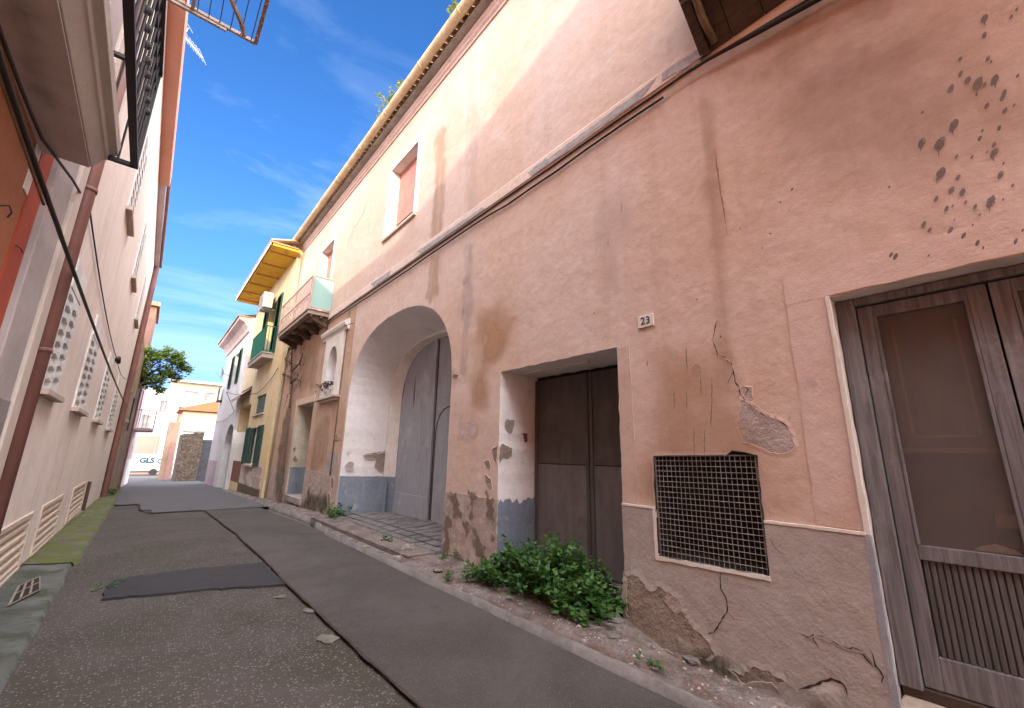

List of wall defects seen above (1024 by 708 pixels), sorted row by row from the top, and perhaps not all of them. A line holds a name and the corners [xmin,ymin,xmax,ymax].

crack [673,320,786,453]
spalling [733,386,800,458]
peeling [321,434,385,516]
peeling [442,419,528,568]
peeling [621,569,792,695]
crack [707,565,752,634]
crack [800,633,886,687]